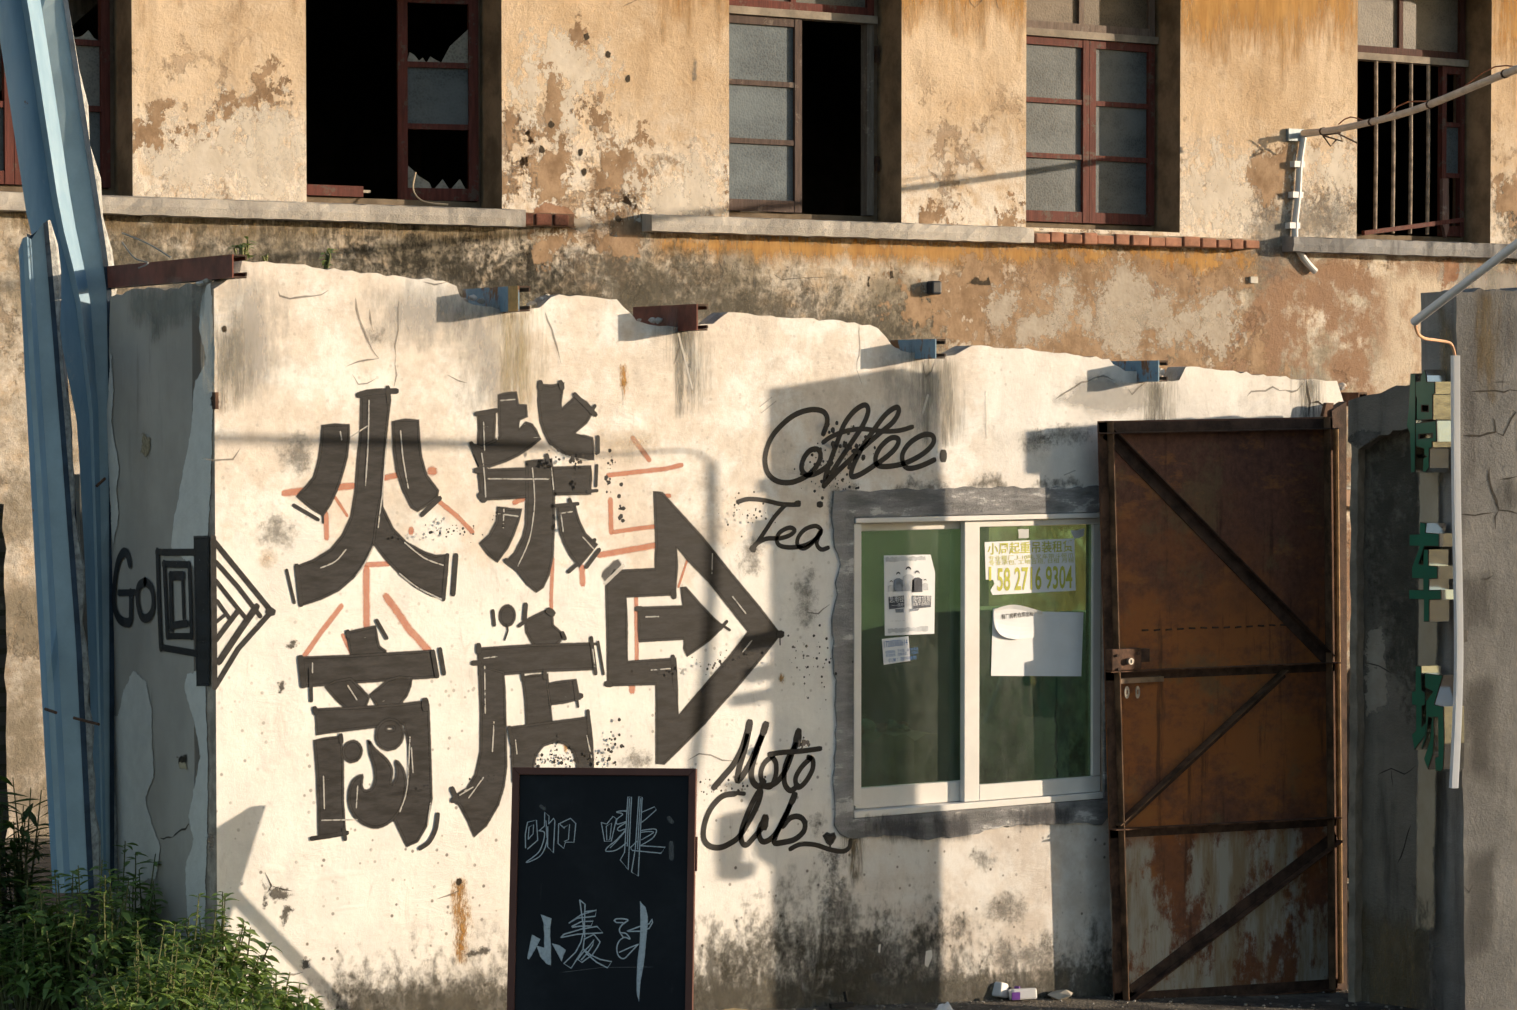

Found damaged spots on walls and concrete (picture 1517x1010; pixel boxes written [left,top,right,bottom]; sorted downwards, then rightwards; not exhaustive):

leakage [902,0,1024,24]
leakage [1181,0,1358,50]
peeling [502,14,729,272]
peeling [1491,173,1517,228]
leakage [103,187,1356,417]
peeling [867,131,1357,411]
leakage [1440,312,1451,382]
crack [1462,389,1517,530]
leakage [831,815,969,870]
leakage [331,952,507,1010]
leakage [693,884,1113,1010]